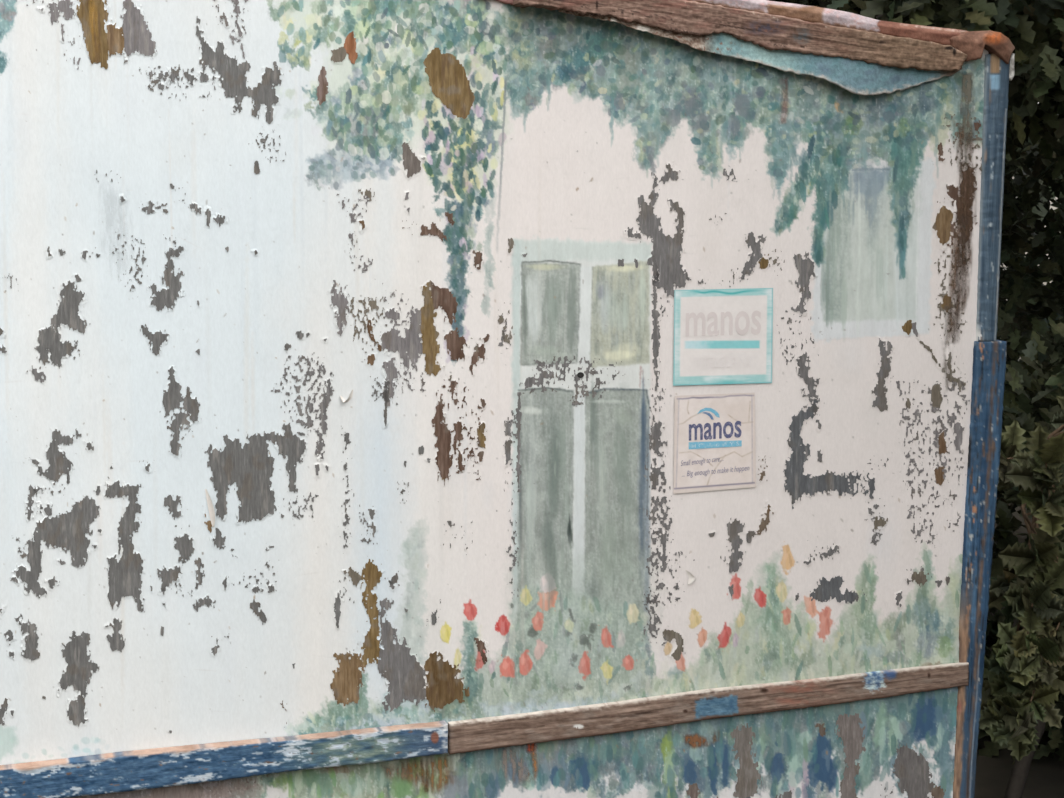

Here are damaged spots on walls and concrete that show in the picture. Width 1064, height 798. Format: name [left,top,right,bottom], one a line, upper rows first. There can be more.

peeling [16,0,286,174]
peeling [26,232,188,385]
peeling [9,278,514,712]
peeling [502,356,625,599]
peeling [618,160,706,663]
peeling [707,231,890,605]
peeling [869,335,970,546]
peeling [892,566,950,609]
peeling [0,698,16,727]
peeling [42,630,99,730]
peeling [814,713,866,798]
peeling [880,743,946,798]